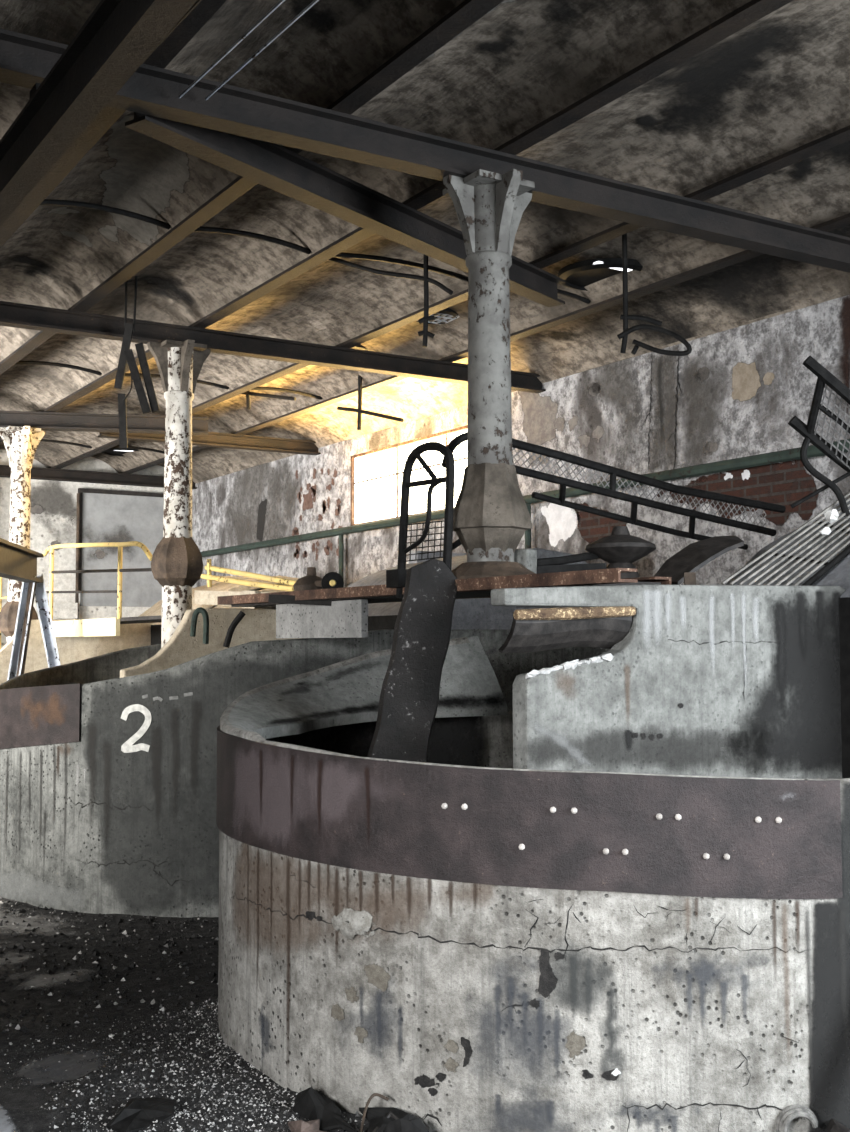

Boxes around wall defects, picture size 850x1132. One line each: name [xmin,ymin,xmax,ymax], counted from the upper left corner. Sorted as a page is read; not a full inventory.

peeling [731,362,775,401]
spalling [525,653,614,679]
damp [532,591,850,1132]
crack [231,893,332,924]
crack [370,899,805,960]
spalling [530,948,564,1009]
damp [260,1016,269,1056]
damp [360,989,402,1056]
damp [483,952,619,1073]
damp [496,1095,553,1132]